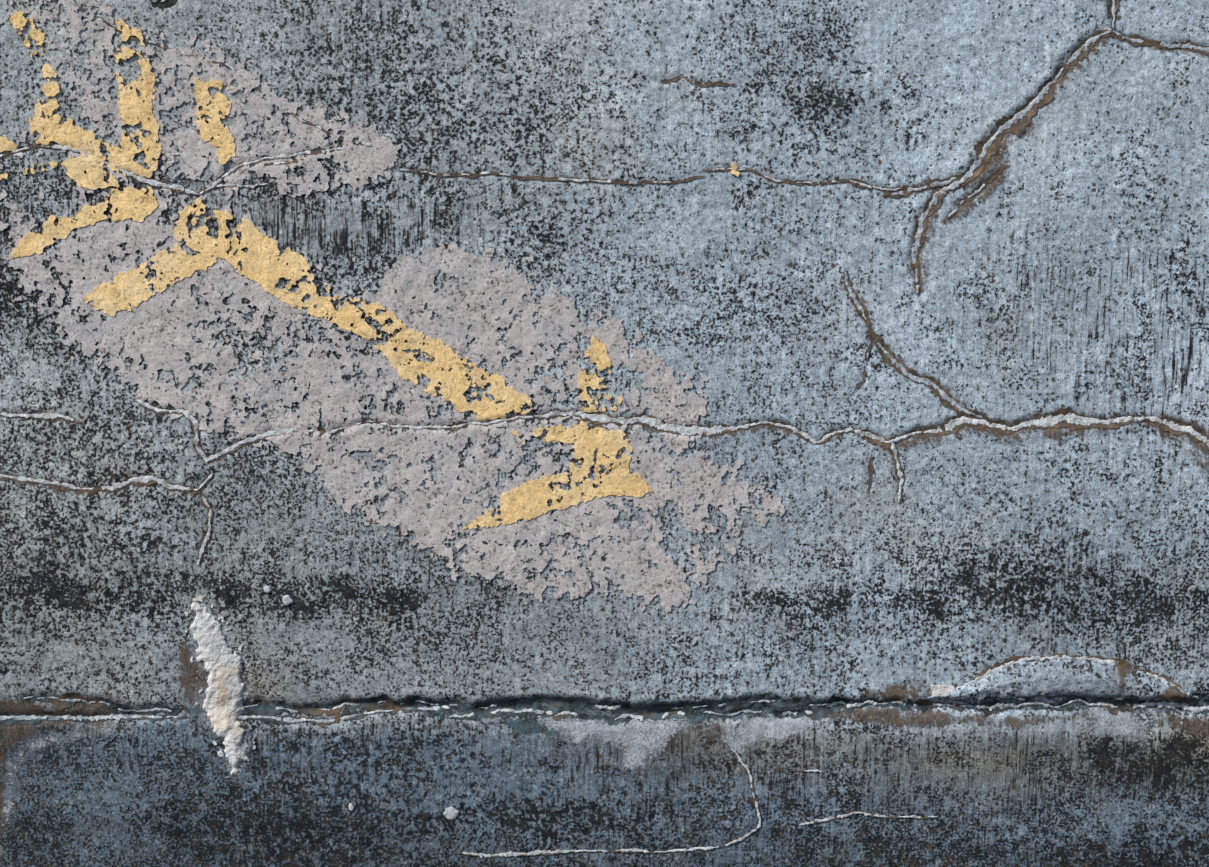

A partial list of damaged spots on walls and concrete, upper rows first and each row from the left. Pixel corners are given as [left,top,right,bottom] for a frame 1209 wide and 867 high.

crack [0,0,1209,296]
peeling [0,0,789,615]
crack [0,271,1209,566]
corrosion [0,696,116,849]
crack [0,692,189,726]
water stain [0,559,430,784]
water stain [153,790,691,867]
water stain [545,711,690,773]
crack [237,693,1209,858]